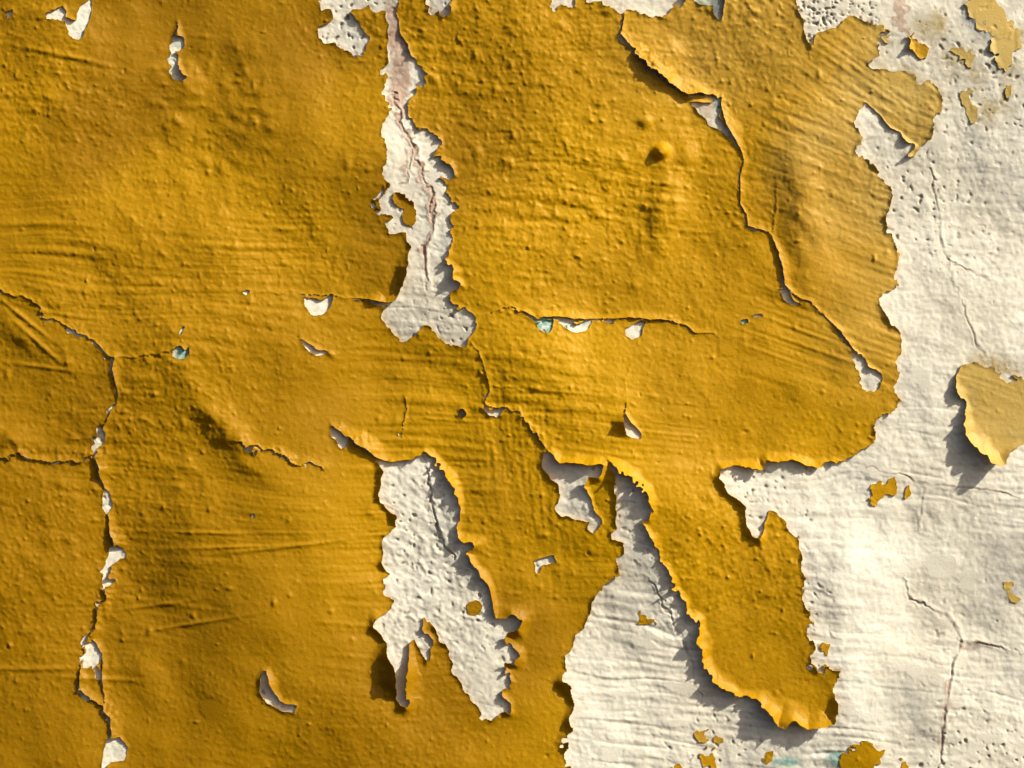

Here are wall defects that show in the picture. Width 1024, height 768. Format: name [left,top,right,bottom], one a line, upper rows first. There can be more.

peeling [314,0,481,351]
crack [389,92,438,292]
crack [616,15,861,354]
crack [0,282,171,768]
peeling [254,665,302,717]
crack [235,437,328,474]
crack [253,289,385,309]
peeling [301,289,338,319]
peeling [328,421,353,453]
peeling [359,439,540,726]
peeling [531,0,1024,768]
crack [904,579,1024,768]